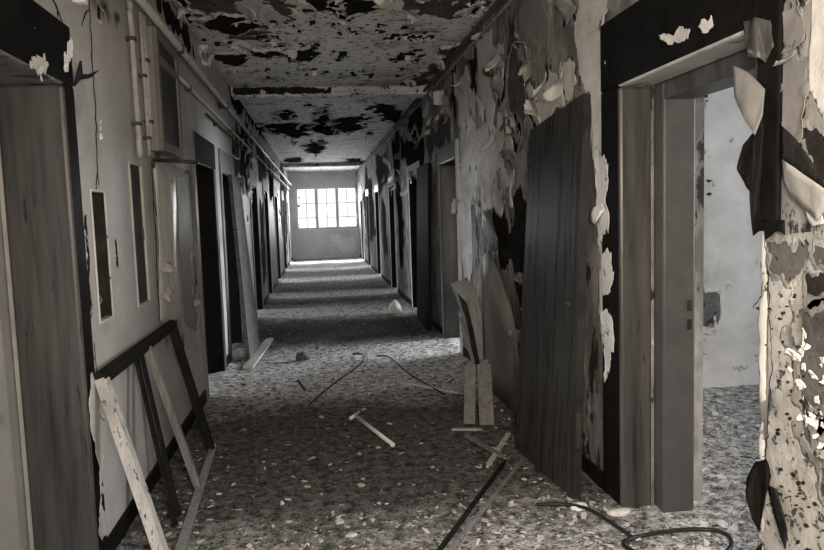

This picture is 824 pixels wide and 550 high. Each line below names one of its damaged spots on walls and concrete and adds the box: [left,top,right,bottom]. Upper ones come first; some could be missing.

peeling [659,15,714,45]
peeling [29,53,49,82]
peeling [63,38,99,87]
peeling [150,0,620,383]
peeling [732,0,824,550]
spalling [703,281,723,335]